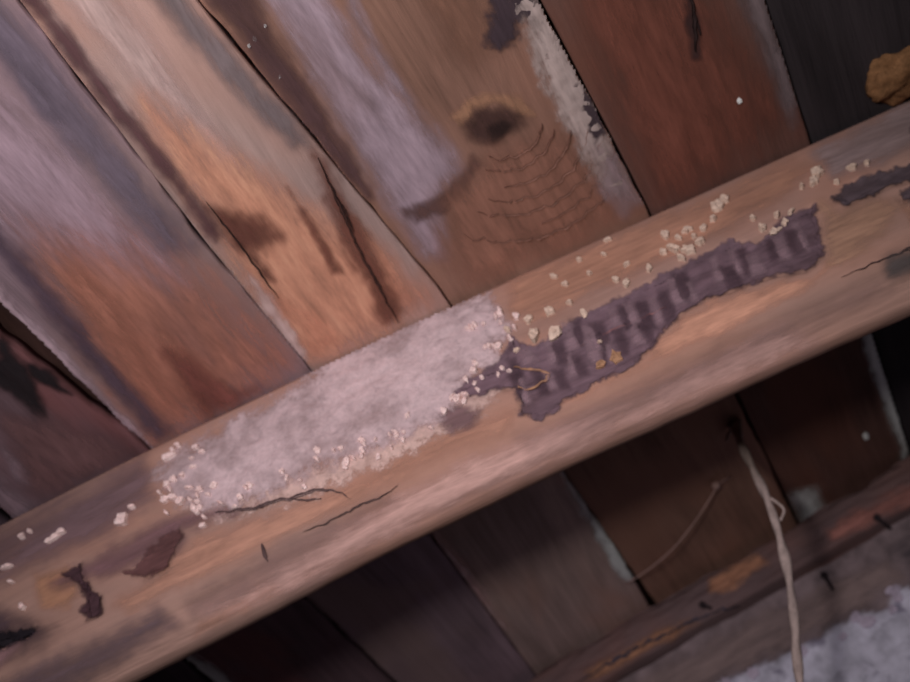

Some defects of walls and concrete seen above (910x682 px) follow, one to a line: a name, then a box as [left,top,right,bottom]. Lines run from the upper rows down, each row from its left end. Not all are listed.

water stain [270,0,635,277]
water stain [817,105,910,175]
water stain [0,0,421,441]
crack [842,246,910,277]
water stain [211,335,806,610]
water stain [0,465,148,578]
water stain [59,512,219,583]
crack [215,486,396,532]
water stain [14,613,166,682]